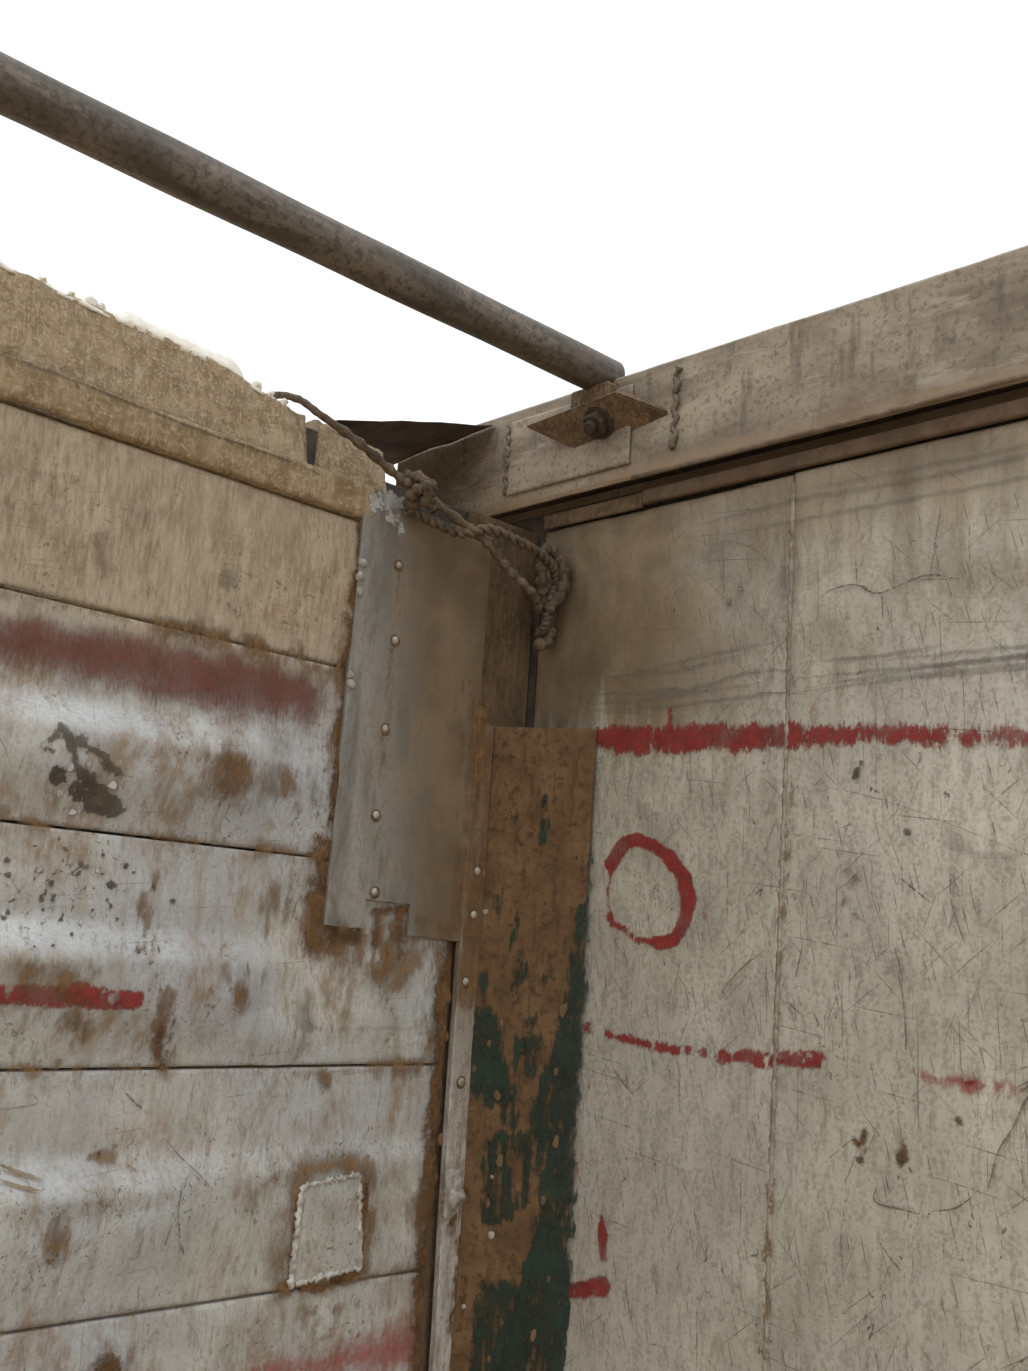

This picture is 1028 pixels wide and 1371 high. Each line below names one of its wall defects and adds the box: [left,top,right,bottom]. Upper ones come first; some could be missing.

corrosion [150,518,452,1371]
peeling [469,854,593,1371]
peeling [539,795,550,845]